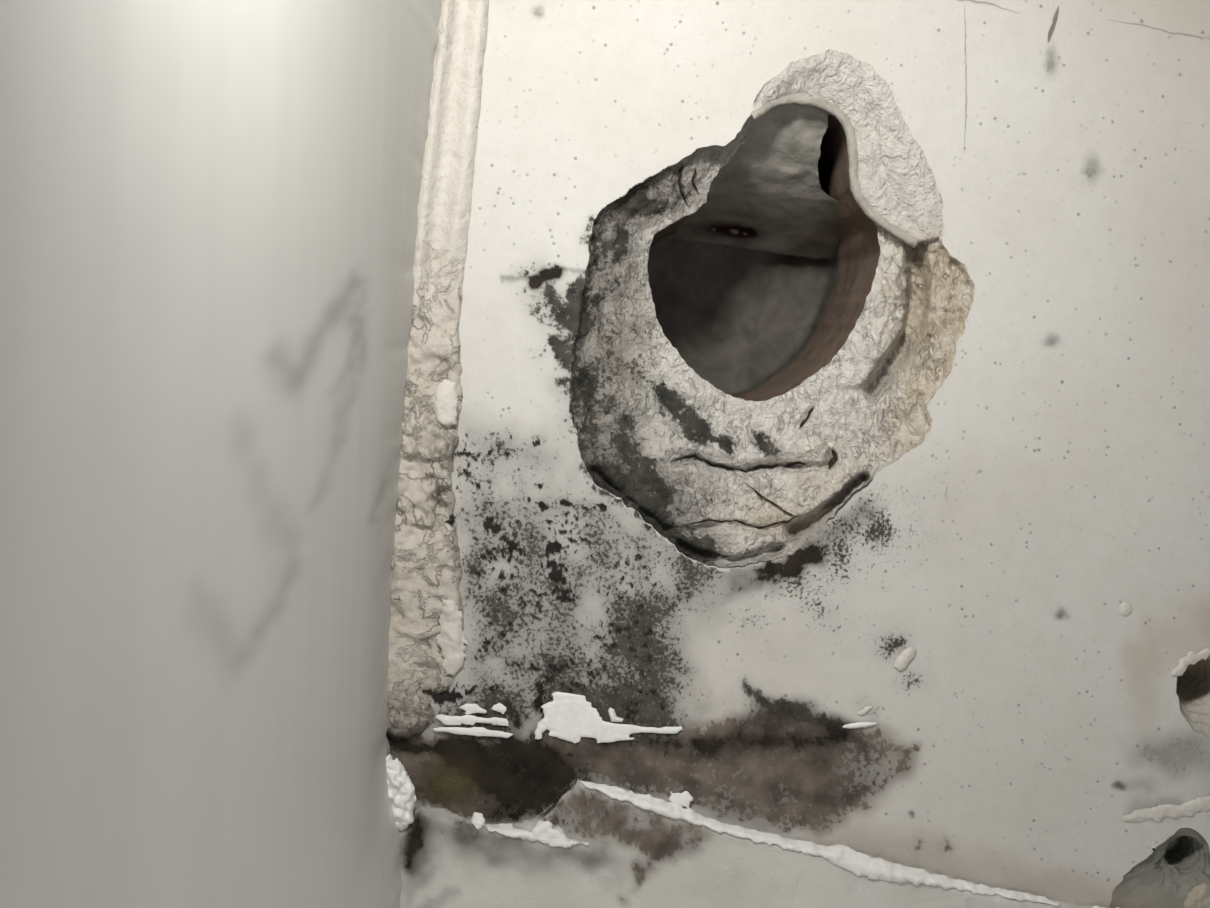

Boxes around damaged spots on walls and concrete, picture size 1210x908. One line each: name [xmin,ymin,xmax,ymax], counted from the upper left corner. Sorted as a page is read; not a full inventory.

leakage [386,168,920,884]
spalling [569,49,975,568]
spalling [1170,648,1210,676]